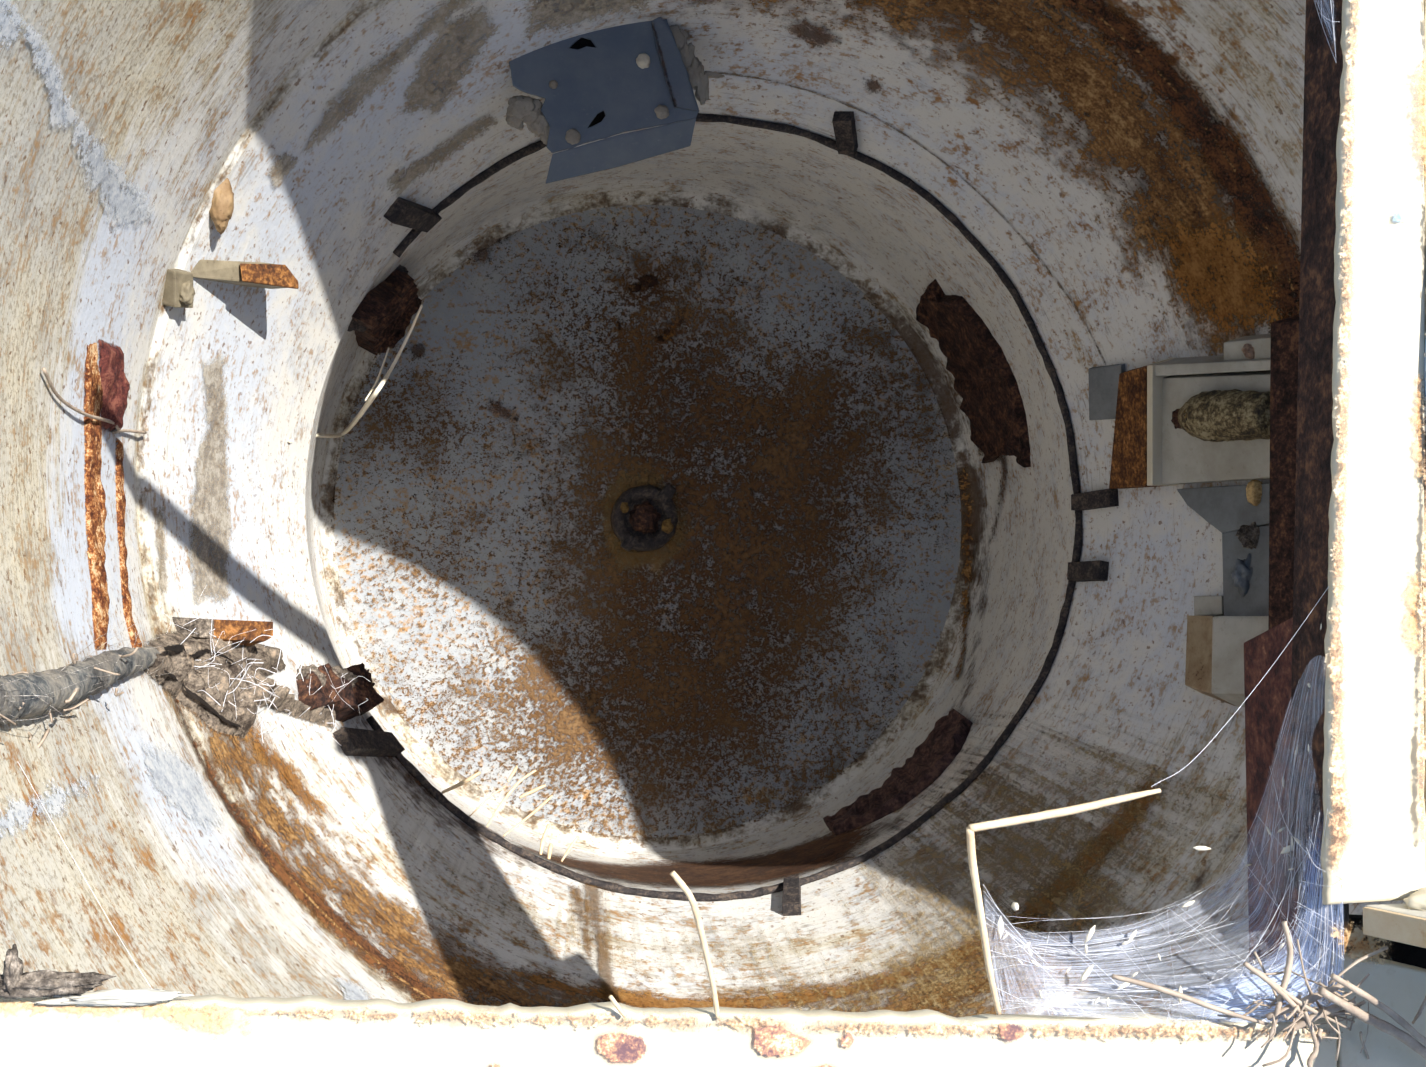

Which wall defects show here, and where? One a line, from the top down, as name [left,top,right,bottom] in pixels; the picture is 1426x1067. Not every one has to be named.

rust [676,0,1301,356]
rust [83,339,142,651]
rust [331,206,1008,841]
rust [0,695,1342,1063]